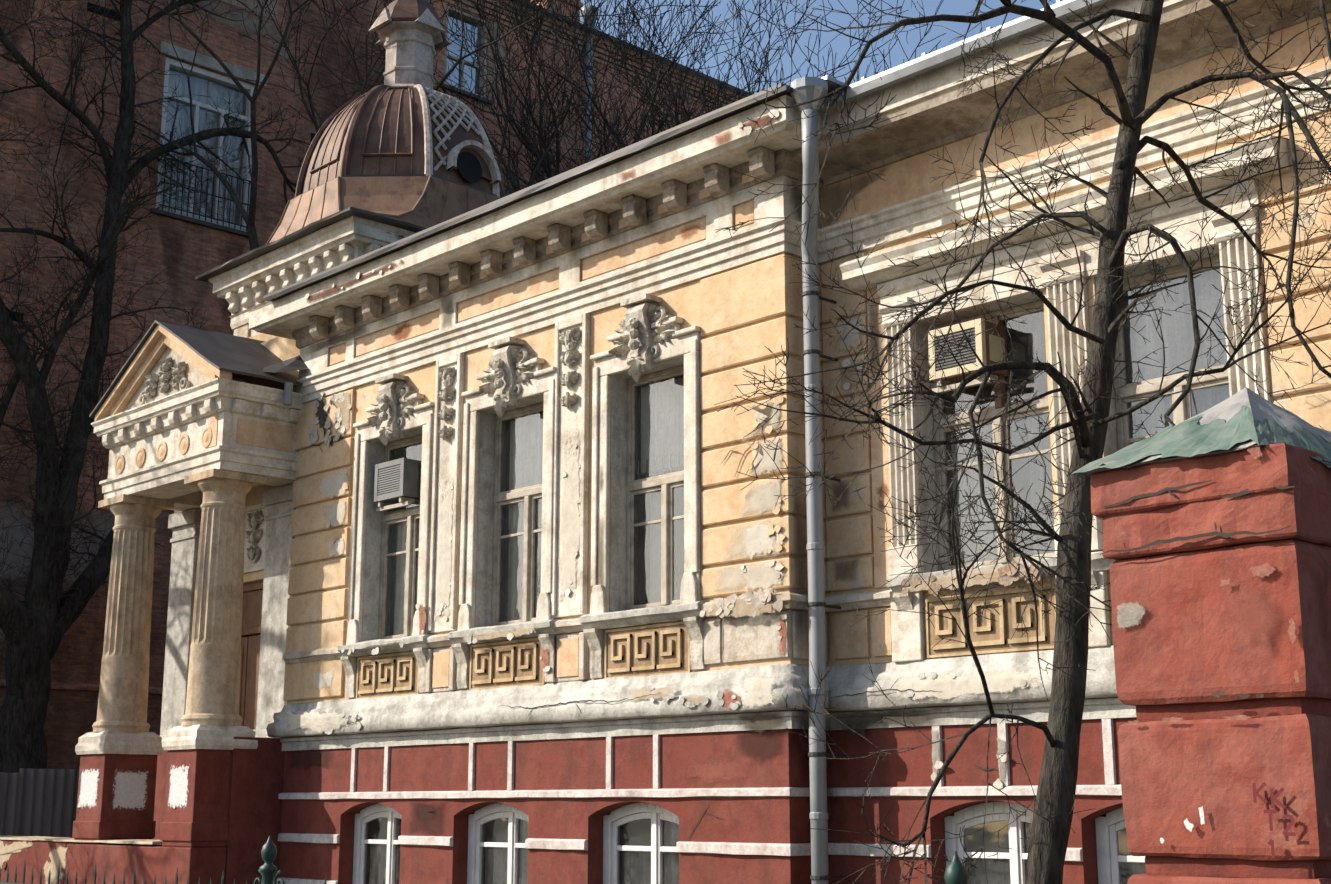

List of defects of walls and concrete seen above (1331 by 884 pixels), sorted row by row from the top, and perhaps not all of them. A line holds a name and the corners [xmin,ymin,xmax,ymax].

spalling [309,392,352,447]
peeling [700,395,787,655]
crack [1100,480,1331,589]
spalling [1117,602,1145,628]
spalling [632,676,775,710]
peeling [285,709,361,735]
peeling [0,840,32,869]
peeling [44,846,68,884]